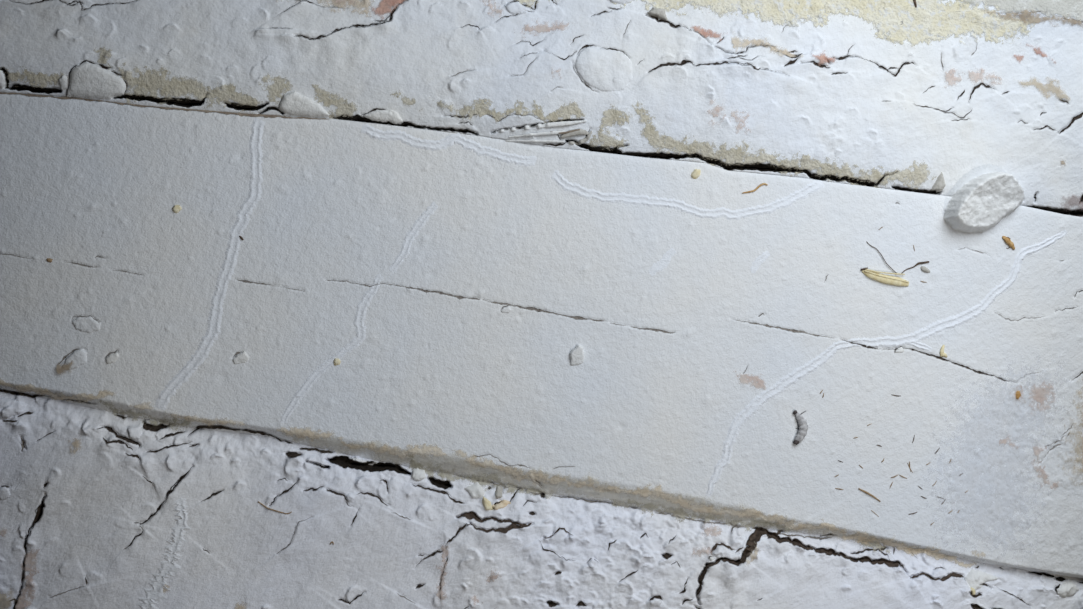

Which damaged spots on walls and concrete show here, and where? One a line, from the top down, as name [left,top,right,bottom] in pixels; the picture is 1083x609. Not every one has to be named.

peeling [642,0,1083,46]
peeling [5,66,63,88]
crack [68,60,128,95]
peeling [94,47,292,112]
peeling [312,84,357,120]
peeling [438,98,584,123]
crack [361,108,824,220]
peeling [588,103,936,189]
crack [98,117,266,609]
crack [397,230,1083,609]
crack [10,483,48,609]
crack [269,478,410,554]